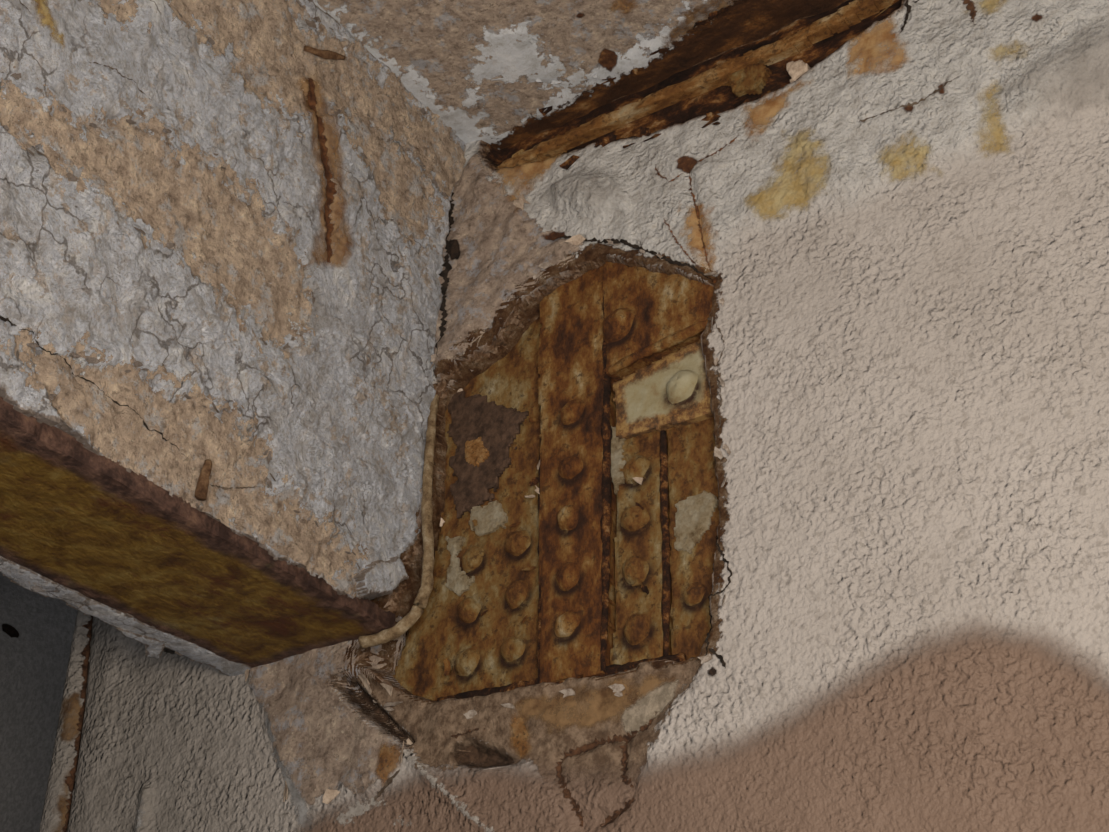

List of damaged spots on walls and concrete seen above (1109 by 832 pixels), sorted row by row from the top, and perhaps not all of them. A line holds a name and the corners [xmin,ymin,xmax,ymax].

crack [901,0,919,32]
crack [963,0,977,22]
rust [480,0,907,200]
rust [982,85,1006,152]
rust [300,78,352,266]
rust [684,204,715,268]
spalling [0,0,732,827]
rust [2,624,19,638]